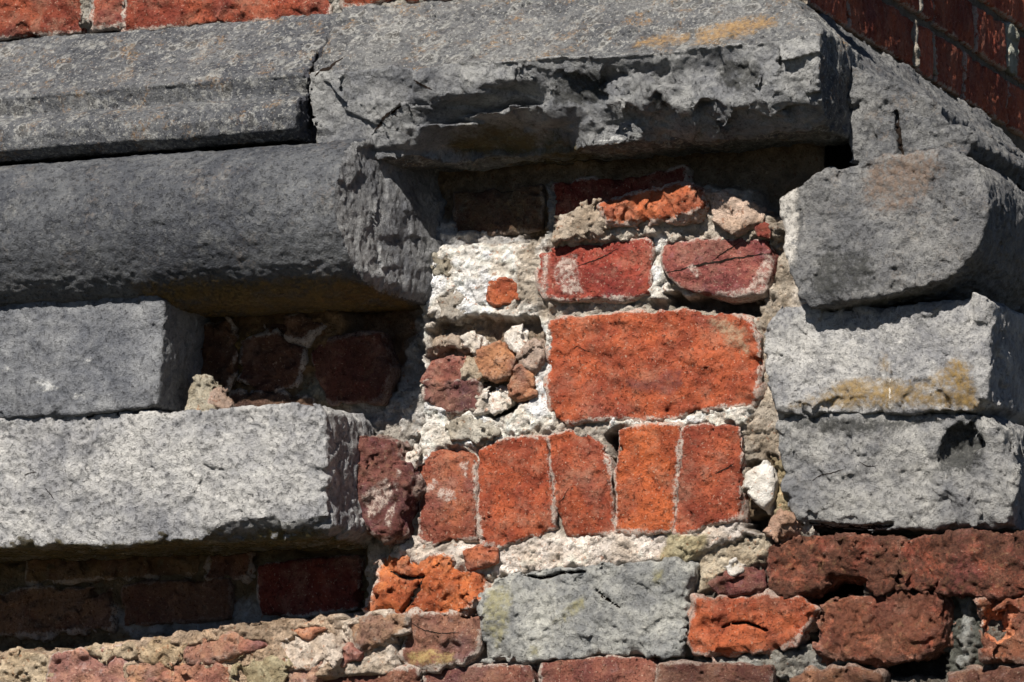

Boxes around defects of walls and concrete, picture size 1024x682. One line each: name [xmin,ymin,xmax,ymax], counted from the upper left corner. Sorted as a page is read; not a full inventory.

crack [315,57,343,76]
crack [374,106,401,132]
spalling [296,36,829,303]
crack [667,241,769,273]
spalling [373,553,472,610]